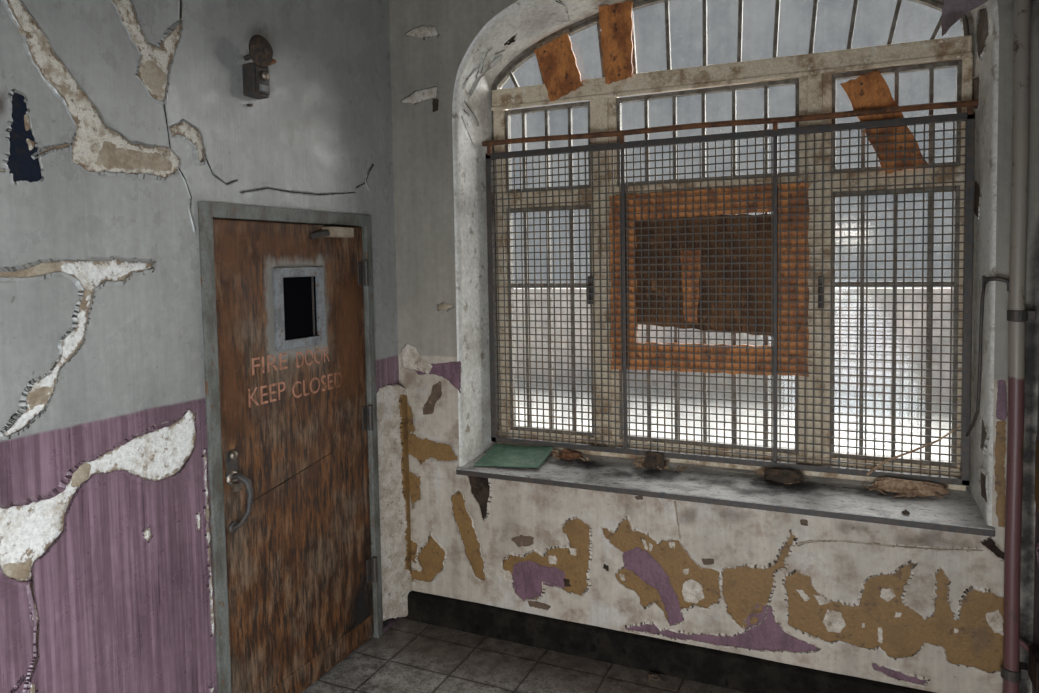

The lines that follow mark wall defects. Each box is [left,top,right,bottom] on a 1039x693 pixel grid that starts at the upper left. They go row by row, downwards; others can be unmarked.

peeling [1,0,207,181]
peeling [941,0,989,111]
peeling [0,255,156,440]
peeling [401,343,461,394]
peeling [0,409,216,641]
flaking render [467,476,492,521]
peeling [979,417,989,504]
flaking render [979,537,1005,562]